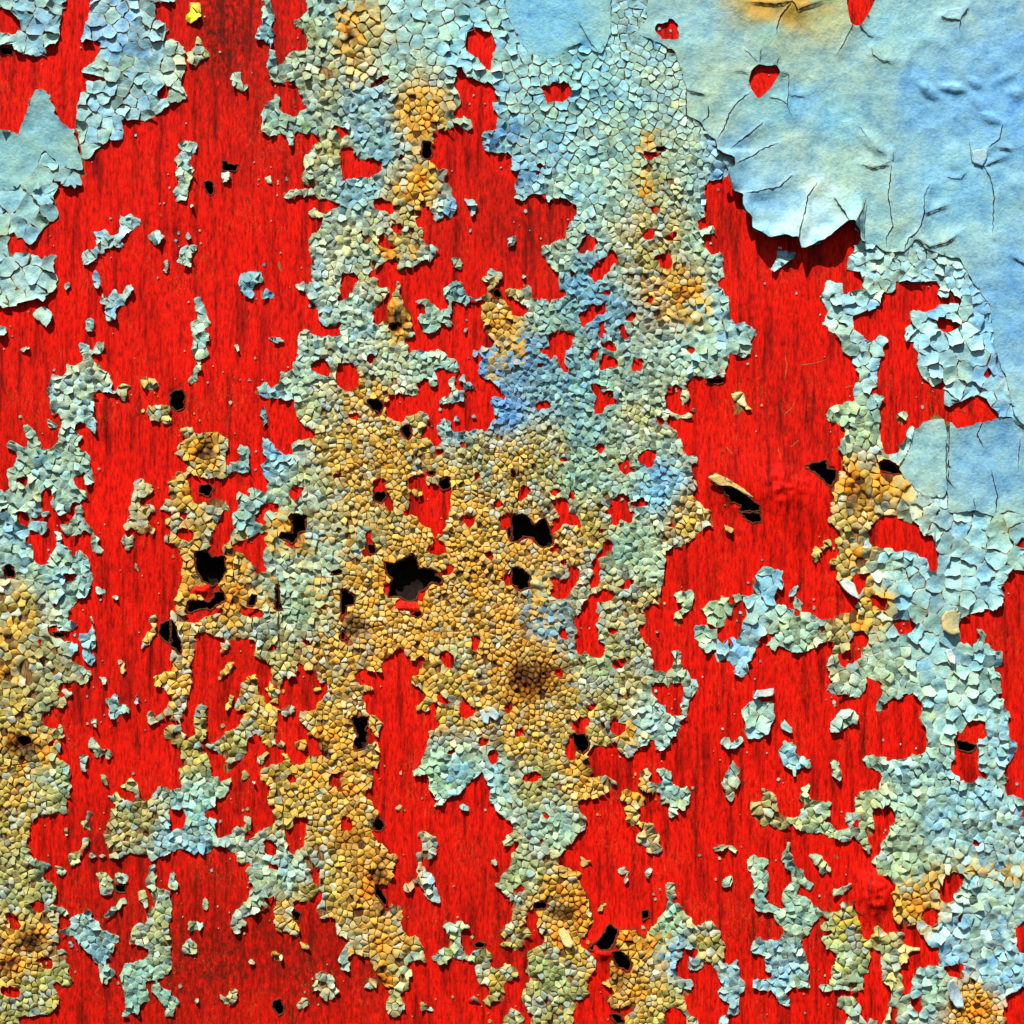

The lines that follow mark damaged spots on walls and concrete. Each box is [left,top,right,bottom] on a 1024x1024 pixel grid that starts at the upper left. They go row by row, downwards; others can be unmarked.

crack [751,0,821,30]
crack [838,23,890,62]
crack [686,51,805,167]
crack [747,125,1009,253]
peeling [0,0,761,1024]
peeling [694,228,1024,1024]